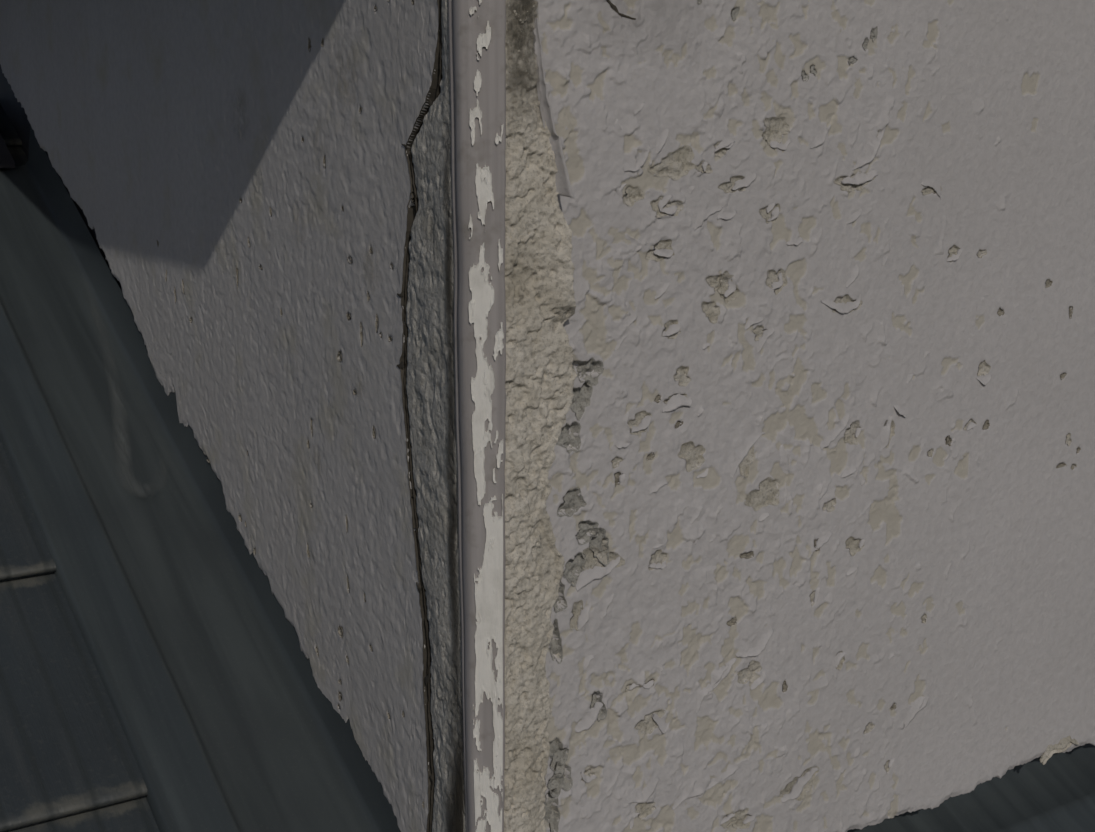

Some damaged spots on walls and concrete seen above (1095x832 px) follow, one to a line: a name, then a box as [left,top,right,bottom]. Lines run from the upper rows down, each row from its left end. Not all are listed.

crack [607,0,636,20]
peeling [849,27,878,65]
peeling [616,129,735,218]
peeling [718,172,757,193]
peeling [834,121,889,192]
peeling [921,178,942,199]
peeling [625,233,675,262]
peeling [702,271,740,324]
crack [397,0,443,832]
spalling [468,0,625,832]
peeling [611,366,704,486]
peeling [744,444,790,522]